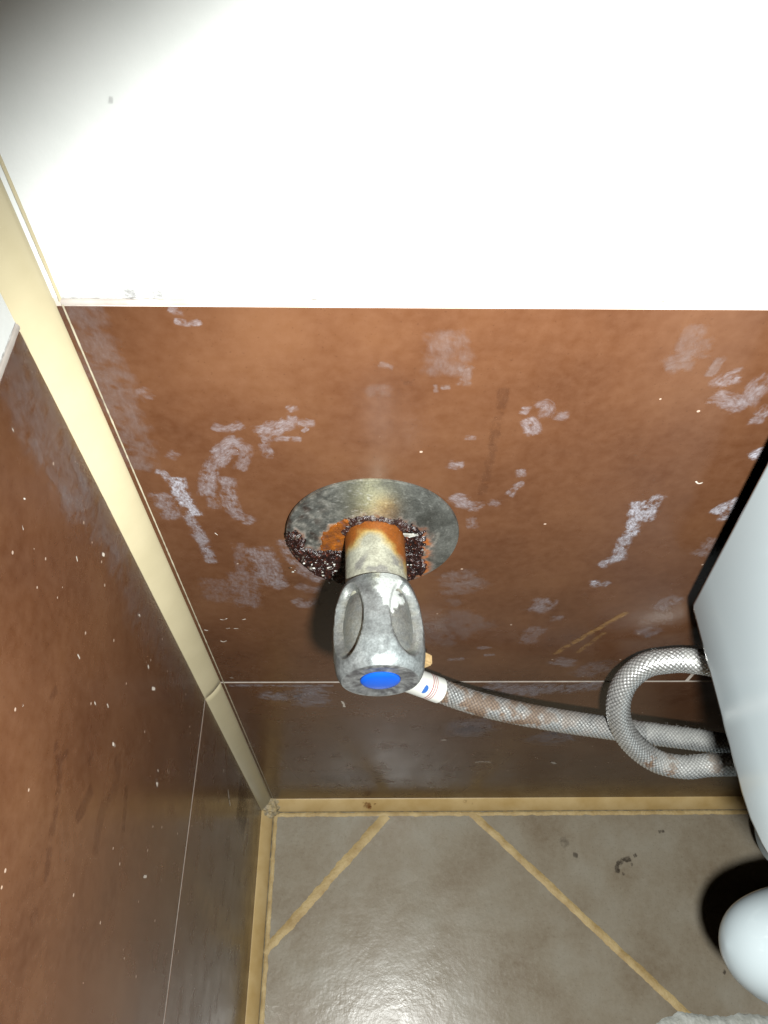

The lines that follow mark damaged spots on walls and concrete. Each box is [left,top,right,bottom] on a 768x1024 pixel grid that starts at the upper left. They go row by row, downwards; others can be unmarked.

rust [285,515,429,585]